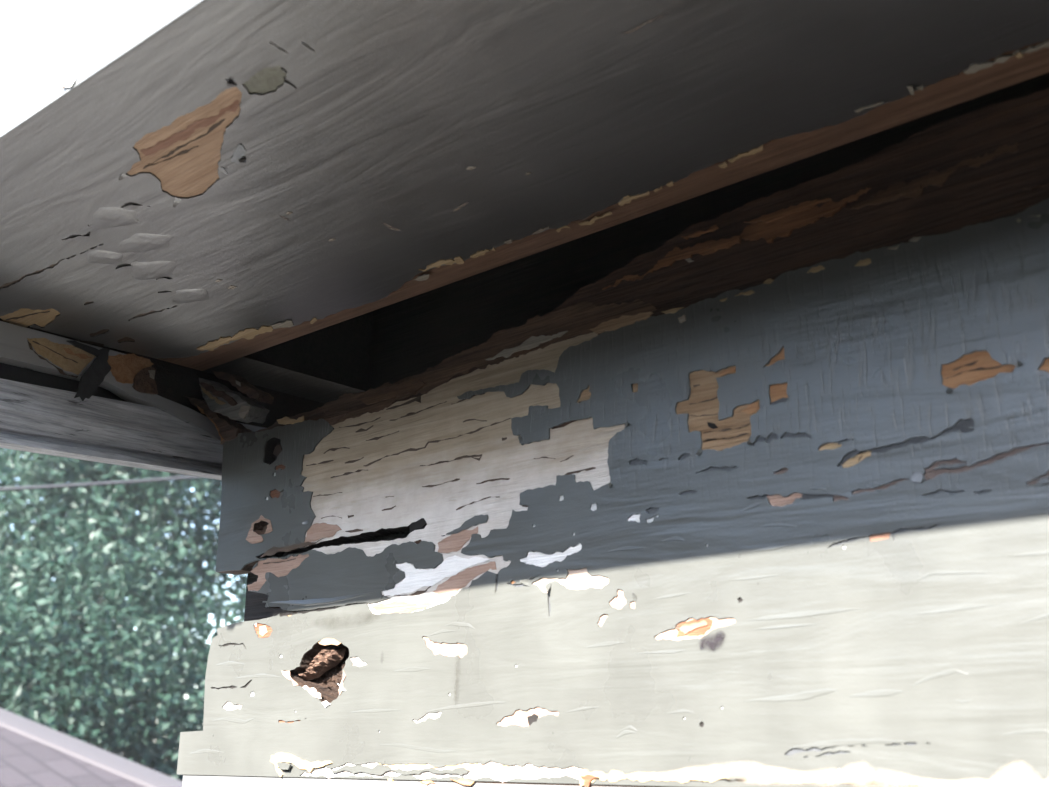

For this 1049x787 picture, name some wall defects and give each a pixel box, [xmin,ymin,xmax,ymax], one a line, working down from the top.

peeling [119,65,286,207]
peeling [0,308,158,394]
peeling [941,351,1021,393]
peeling [676,366,789,456]
crack [752,432,813,446]
peeling [247,331,637,627]
crack [630,453,738,495]
crack [748,493,767,501]
crack [802,419,1049,502]
crack [258,518,427,559]
crack [828,525,940,548]
peeling [270,752,729,787]